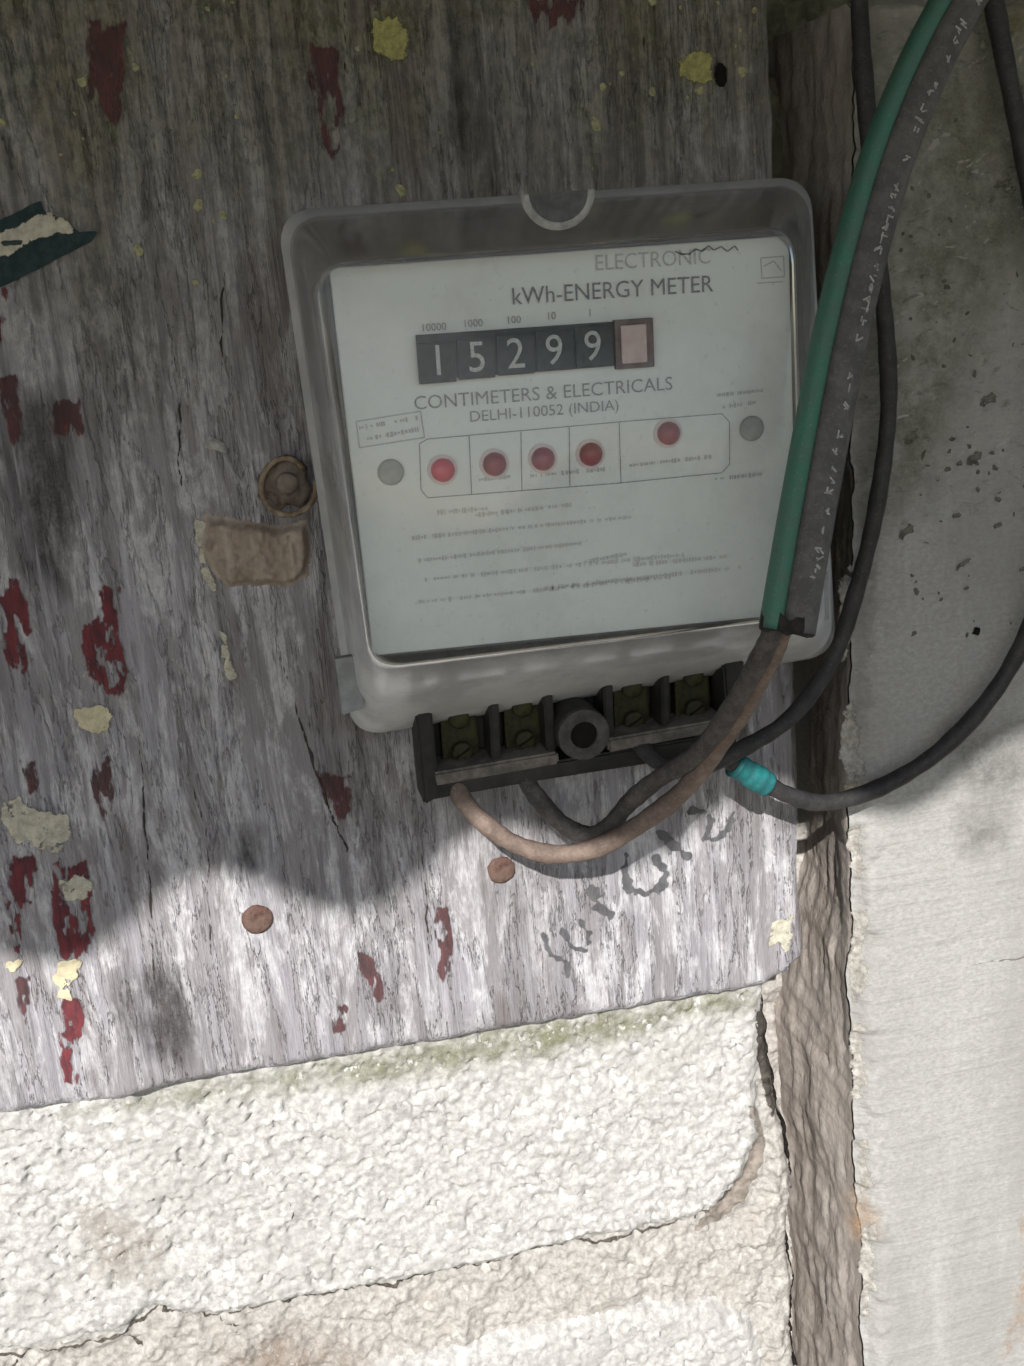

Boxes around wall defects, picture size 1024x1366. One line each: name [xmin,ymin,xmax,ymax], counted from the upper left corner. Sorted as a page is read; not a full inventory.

peeling [0,375,22,445]
peeling [50,399,84,437]
peeling [0,576,33,674]
peeling [82,585,128,696]
peeling [19,760,39,795]
peeling [90,756,114,821]
peeling [5,855,95,960]
peeling [15,976,30,1024]
peeling [58,998,84,1084]
crack [0,1179,738,1366]